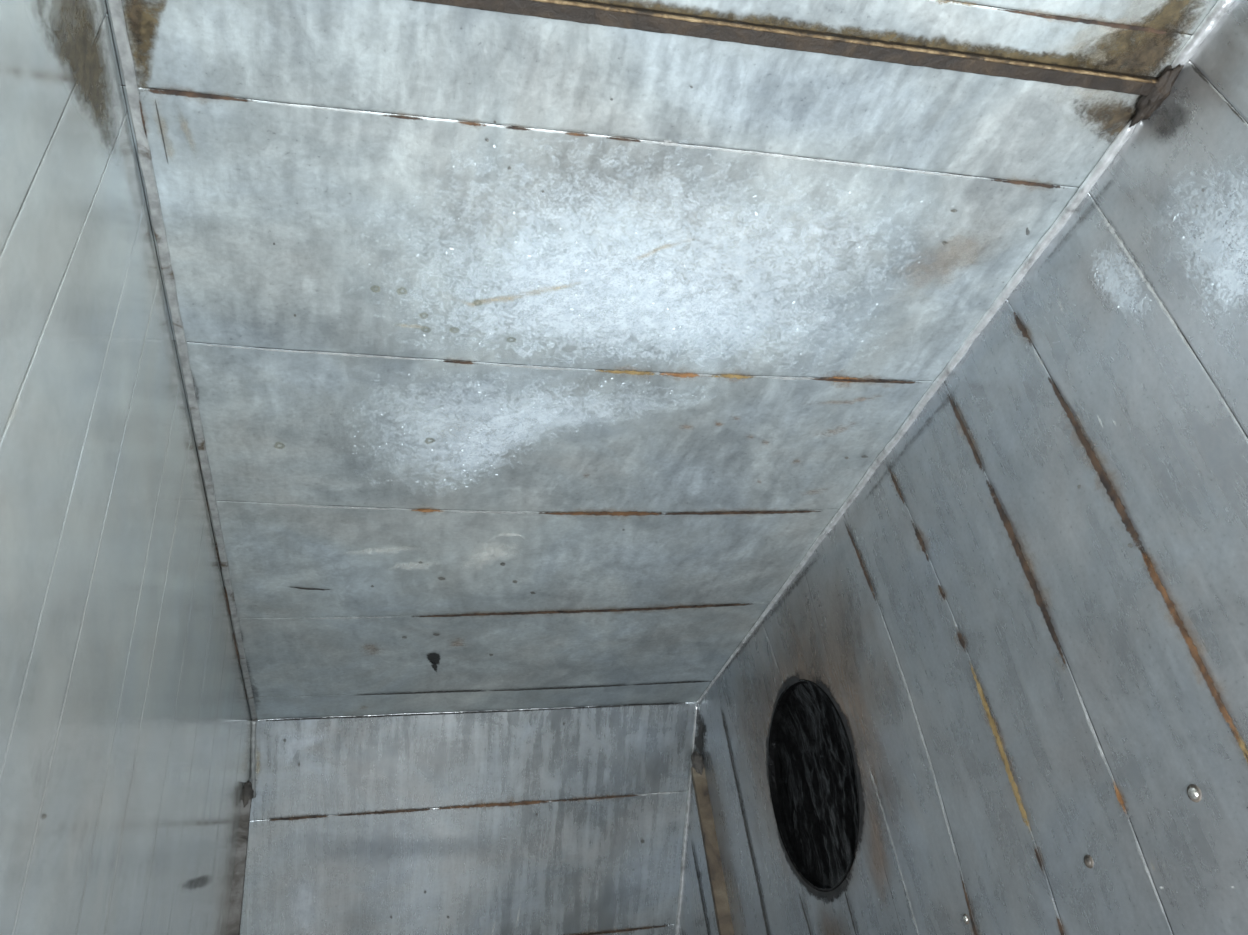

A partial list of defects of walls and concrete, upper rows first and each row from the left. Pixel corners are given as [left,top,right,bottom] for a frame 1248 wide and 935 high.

rust [937,0,1172,35]
rust [1012,312,1031,345]
rust [596,370,752,379]
rust [912,523,929,561]
rust [947,394,1067,667]
rust [1048,377,1248,762]
rust [416,603,751,617]
rust [971,666,1031,830]
rust [270,795,638,821]
rust [577,925,666,935]